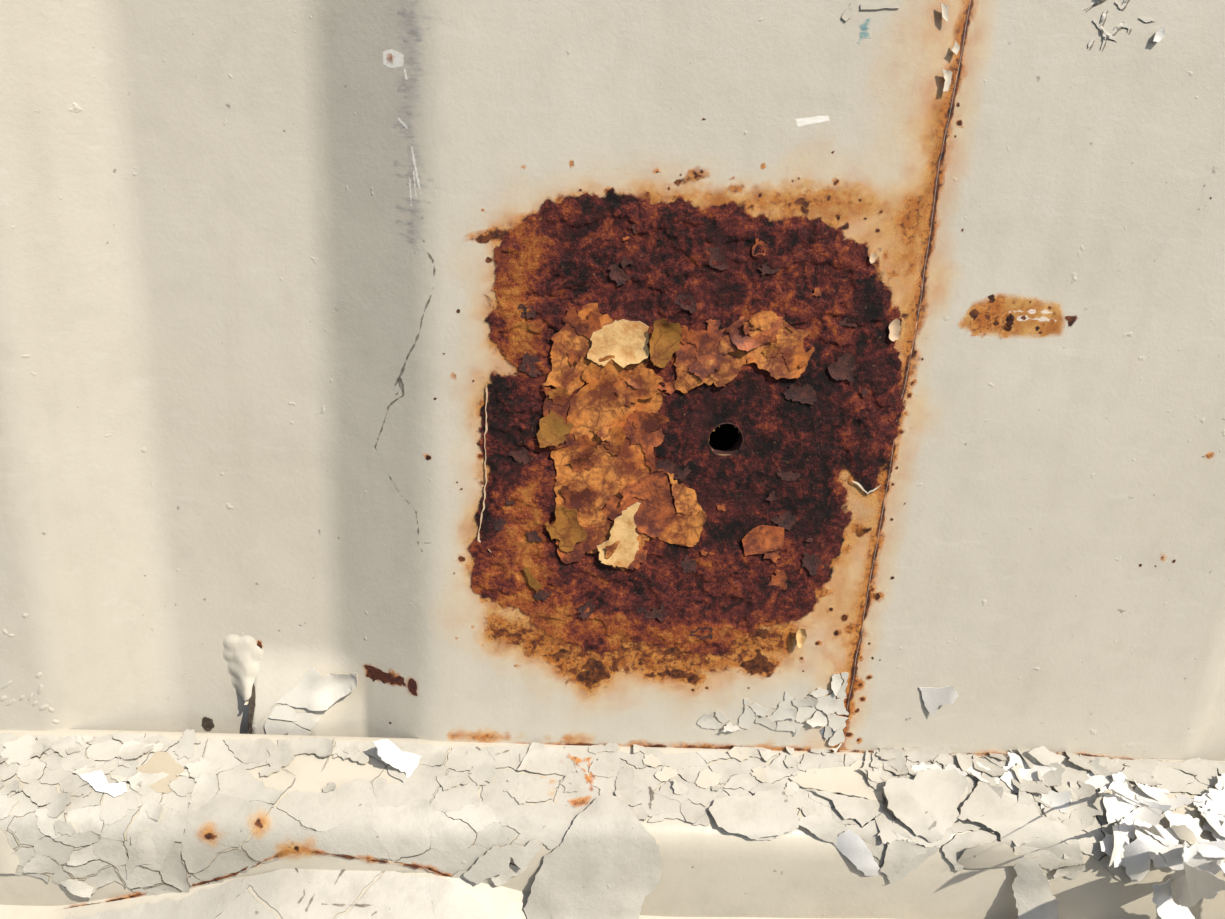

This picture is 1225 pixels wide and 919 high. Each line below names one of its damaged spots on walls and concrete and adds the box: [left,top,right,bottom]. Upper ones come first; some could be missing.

rust [960,294,1078,338]
crack [375,252,436,552]
rust [447,0,982,753]
rust [363,664,418,696]
peeling [0,667,1225,919]
rust [547,734,811,807]
rust [1056,752,1135,760]